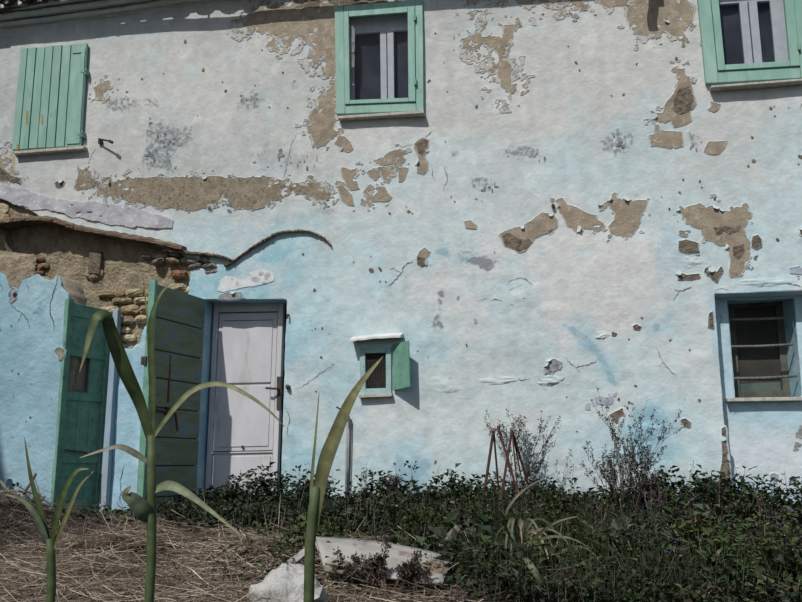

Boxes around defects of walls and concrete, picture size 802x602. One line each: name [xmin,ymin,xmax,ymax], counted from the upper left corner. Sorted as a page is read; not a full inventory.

peeling [86,74,119,104]
peeling [227,0,354,153]
peeling [453,0,701,114]
peeling [643,57,697,149]
peeling [707,101,721,113]
peeling [54,137,430,214]
peeling [0,270,32,304]
peeling [498,192,651,254]
peeling [668,193,763,284]
peeling [788,265,802,280]